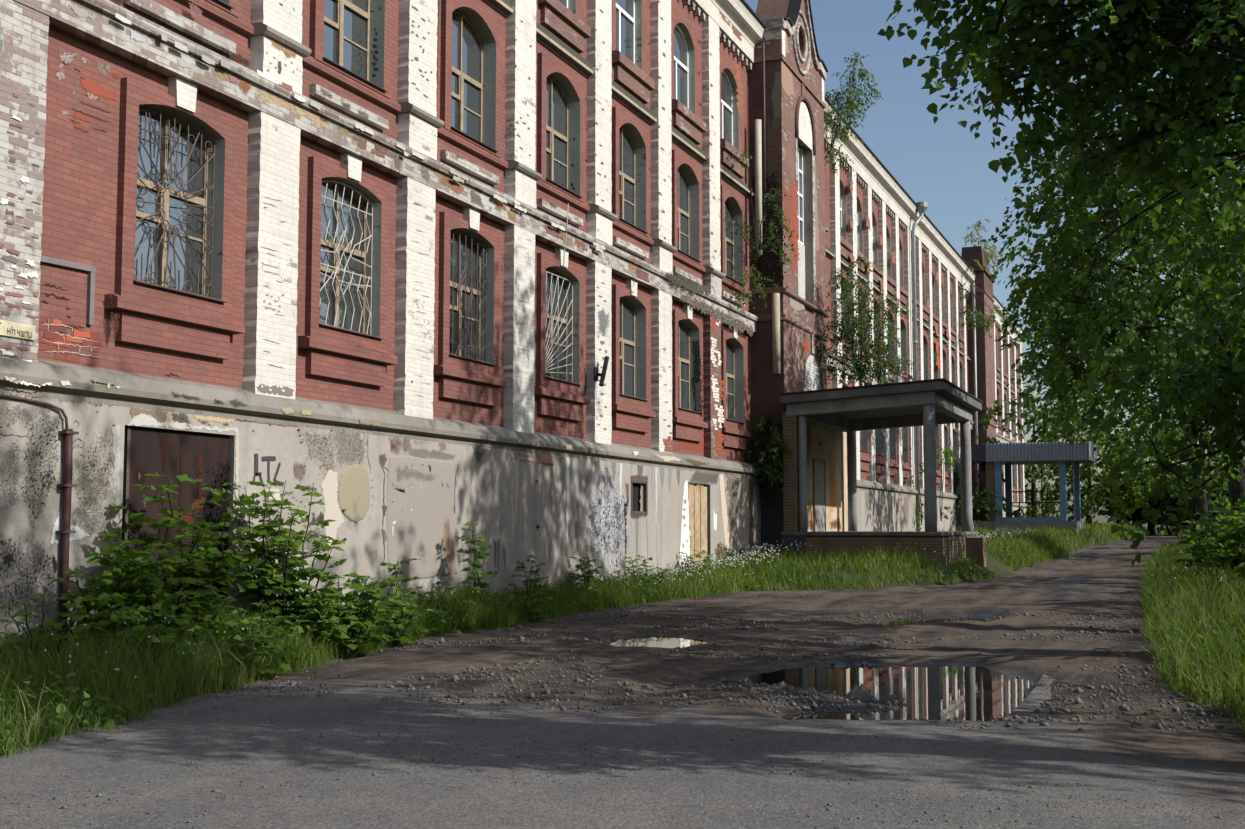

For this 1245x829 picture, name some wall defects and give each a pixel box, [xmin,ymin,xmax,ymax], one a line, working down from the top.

spalling [56,52,134,101]
peeling [188,2,223,35]
flaking render [267,51,295,98]
peeling [412,5,433,98]
flaking render [347,128,393,158]
flaking render [0,190,41,263]
flaking render [0,279,103,363]
damp [0,404,64,621]
damp [70,496,117,545]
damp [543,456,754,569]